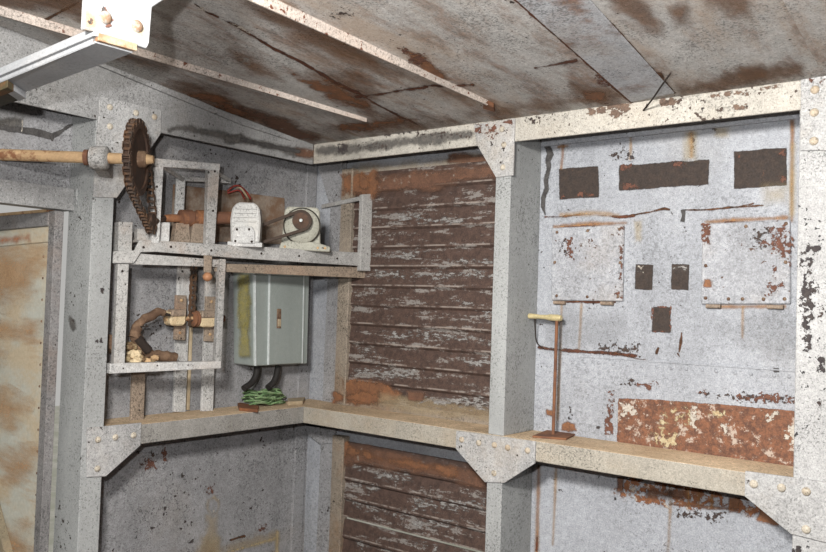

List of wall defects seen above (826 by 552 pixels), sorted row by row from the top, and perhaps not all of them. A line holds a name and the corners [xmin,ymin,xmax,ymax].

peeling [586,103,632,118]
peeling [659,97,679,111]
peeling [696,89,749,113]
peeling [393,213,463,225]
peeling [373,258,493,280]
peeling [750,221,824,352]
rust [332,378,424,406]
rust [617,398,794,466]
peeling [352,470,411,491]
rust [614,477,779,525]
peeling [393,498,486,529]